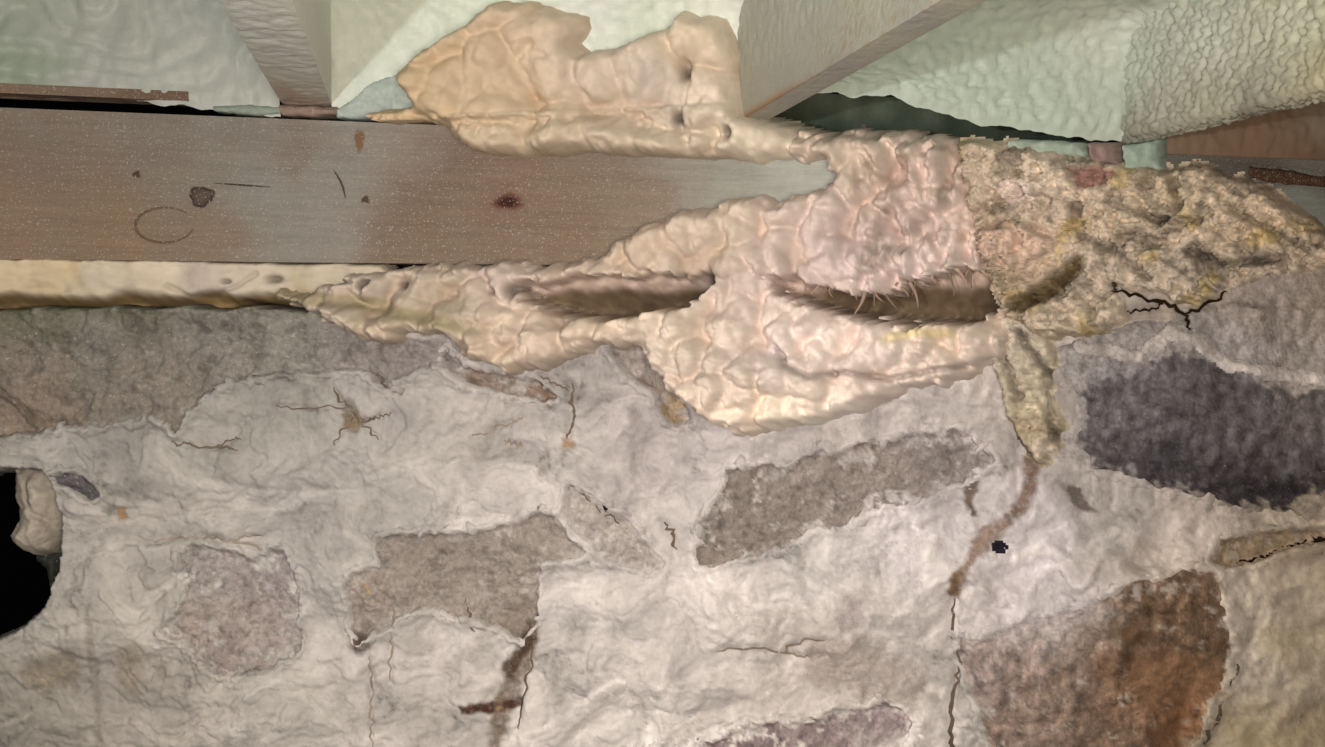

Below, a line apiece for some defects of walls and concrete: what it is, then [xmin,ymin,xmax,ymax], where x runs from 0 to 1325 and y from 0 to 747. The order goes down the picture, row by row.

crack [1111,289,1227,330]
crack [1236,536,1325,564]